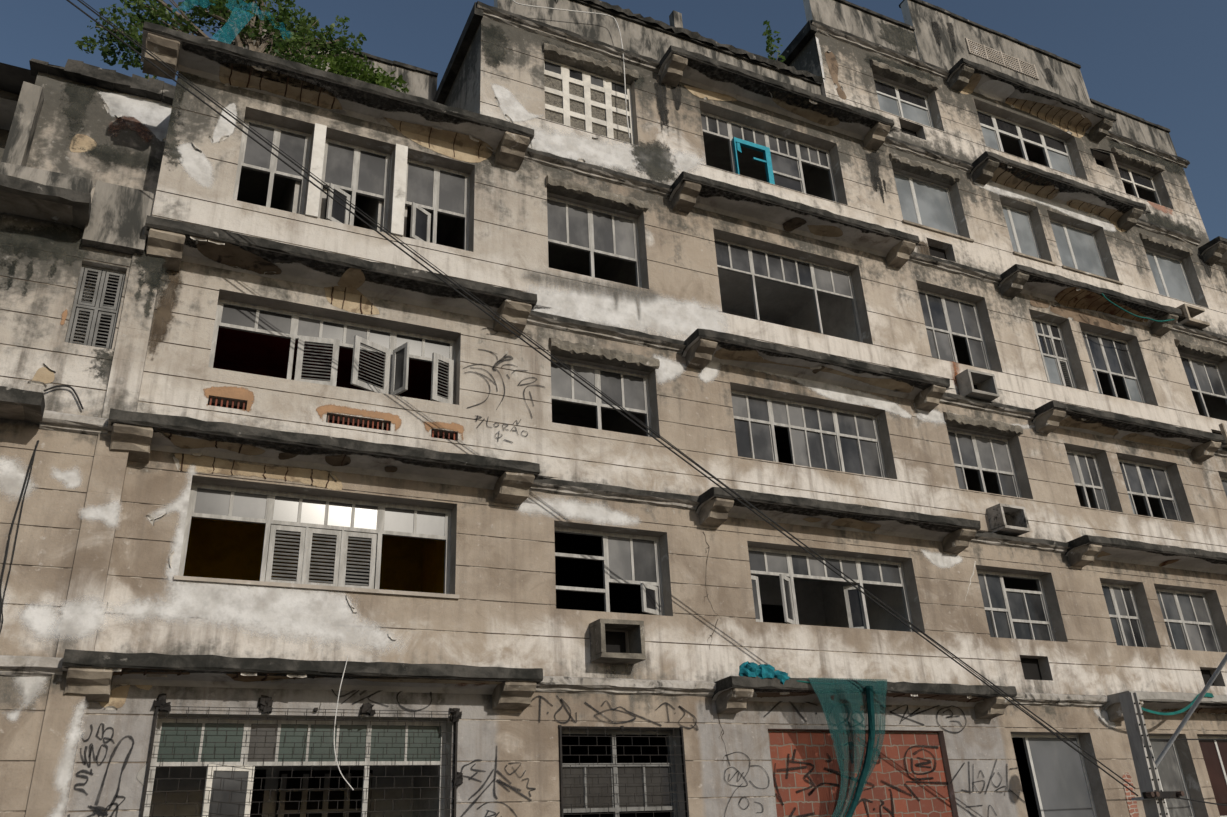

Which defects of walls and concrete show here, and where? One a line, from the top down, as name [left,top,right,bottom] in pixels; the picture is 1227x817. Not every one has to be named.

water stain [672,53,905,134]
spalling [69,134,97,153]
peeling [100,93,237,187]
spalling [383,117,496,163]
water stain [631,75,932,256]
water stain [0,224,88,296]
water stain [135,226,197,354]
spalling [190,236,282,275]
spalling [324,268,380,315]
water stain [231,243,551,310]
water stain [528,273,655,312]
spalling [1050,287,1148,332]